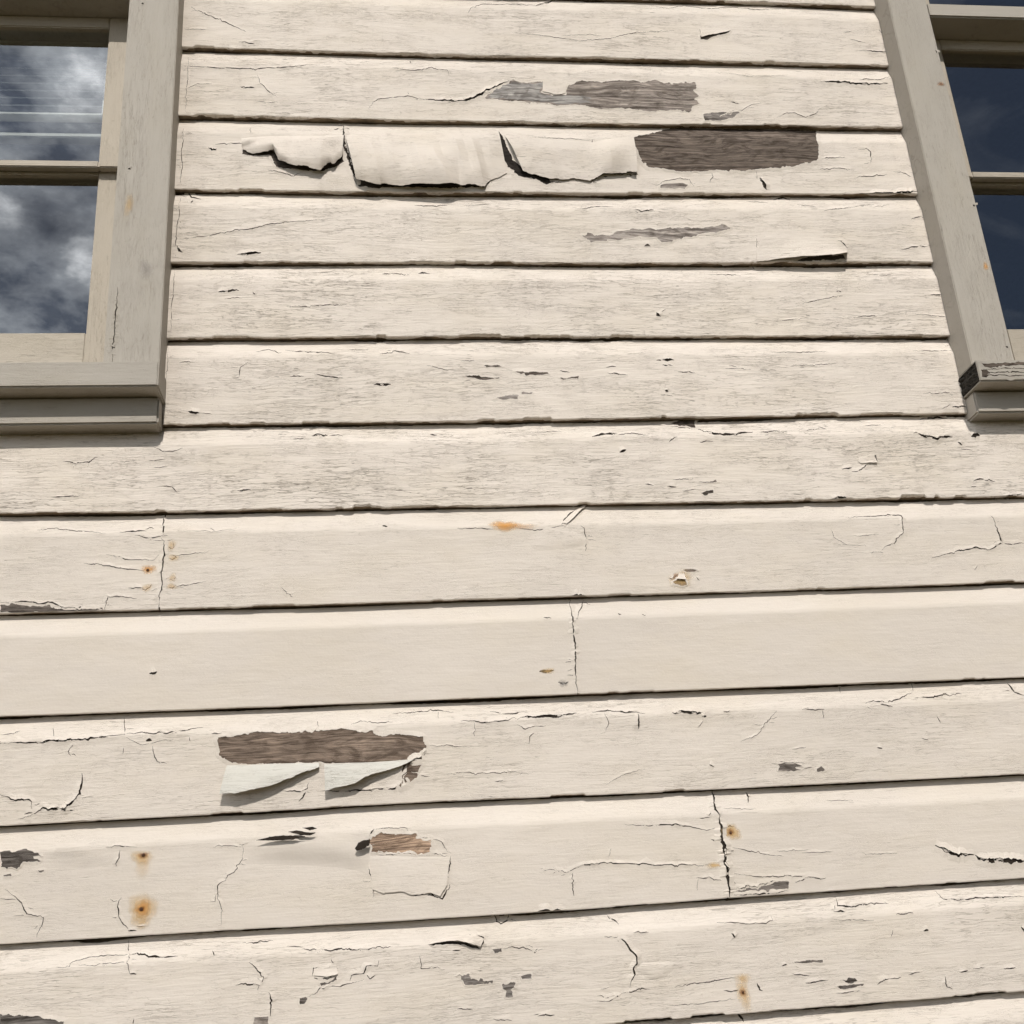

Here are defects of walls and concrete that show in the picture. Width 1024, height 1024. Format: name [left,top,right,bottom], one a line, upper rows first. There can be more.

peeling [206,76,823,190]
peeling [580,222,732,245]
peeling [749,229,850,270]
crack [912,280,1024,571]
rust [457,522,564,534]
rust [139,567,178,594]
crack [392,599,645,786]
peeling [0,717,430,804]
peeling [0,846,47,879]
rust [136,903,149,917]
crack [491,791,833,942]
crack [932,840,1024,934]